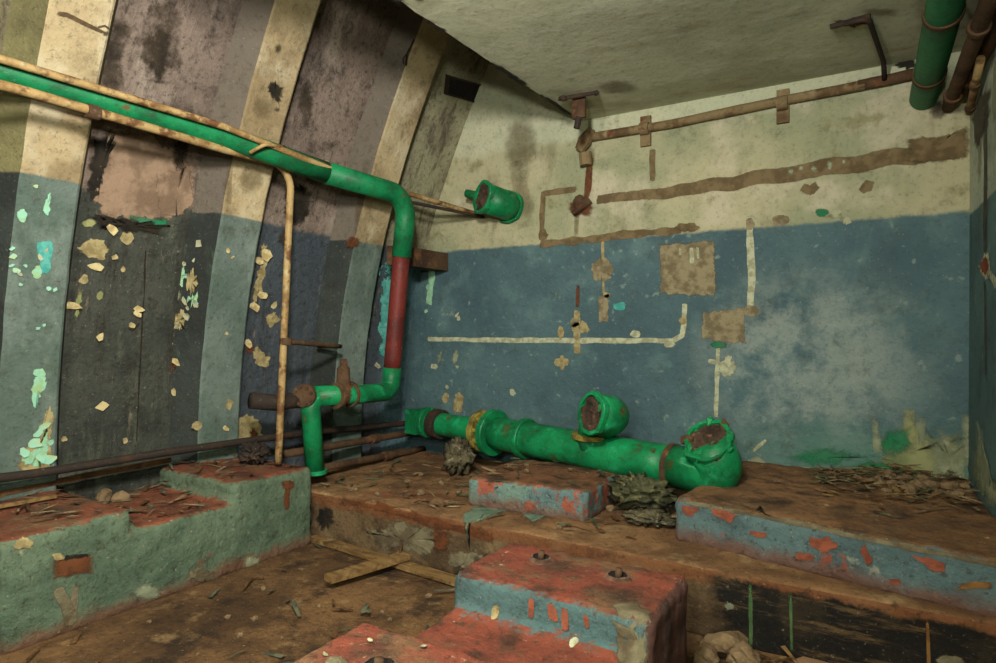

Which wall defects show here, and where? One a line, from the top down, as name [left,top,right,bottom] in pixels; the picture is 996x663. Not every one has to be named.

leakage [102,22,129,89]
leakage [144,2,180,76]
leakage [87,134,115,201]
leakage [174,141,188,168]
flaking render [67,127,196,318]
leakage [95,215,168,235]
peeling [9,240,58,292]
peeling [129,305,145,328]
peeling [174,240,202,331]
flaking render [659,240,716,296]
flaking render [701,216,759,417]
peeling [796,410,970,499]